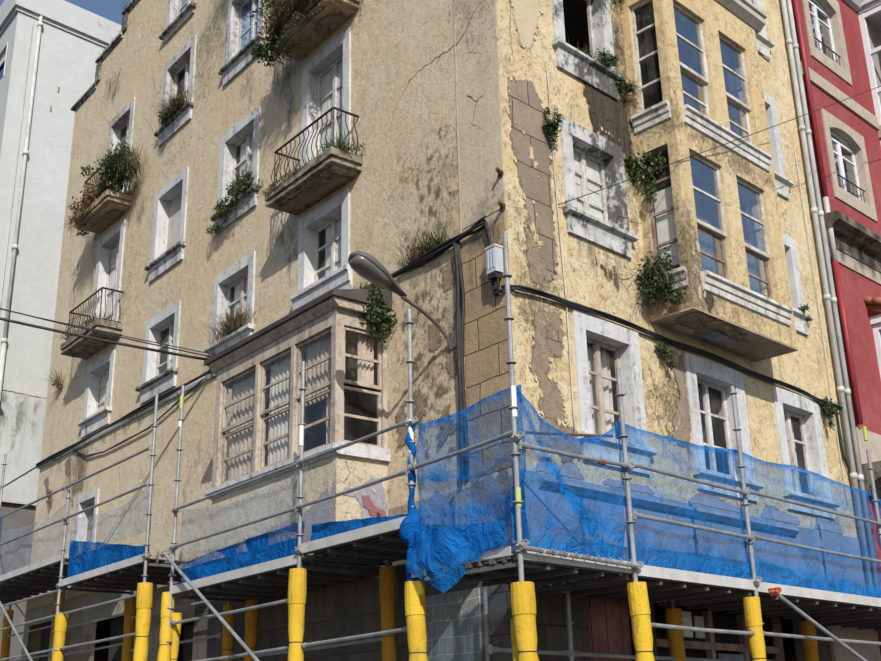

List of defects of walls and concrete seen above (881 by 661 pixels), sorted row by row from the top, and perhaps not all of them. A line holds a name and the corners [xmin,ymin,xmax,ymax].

crack [394,1,482,111]
peeling [507,75,559,290]
peeling [529,310,597,480]
crack [646,368,672,462]
peeling [263,477,387,543]